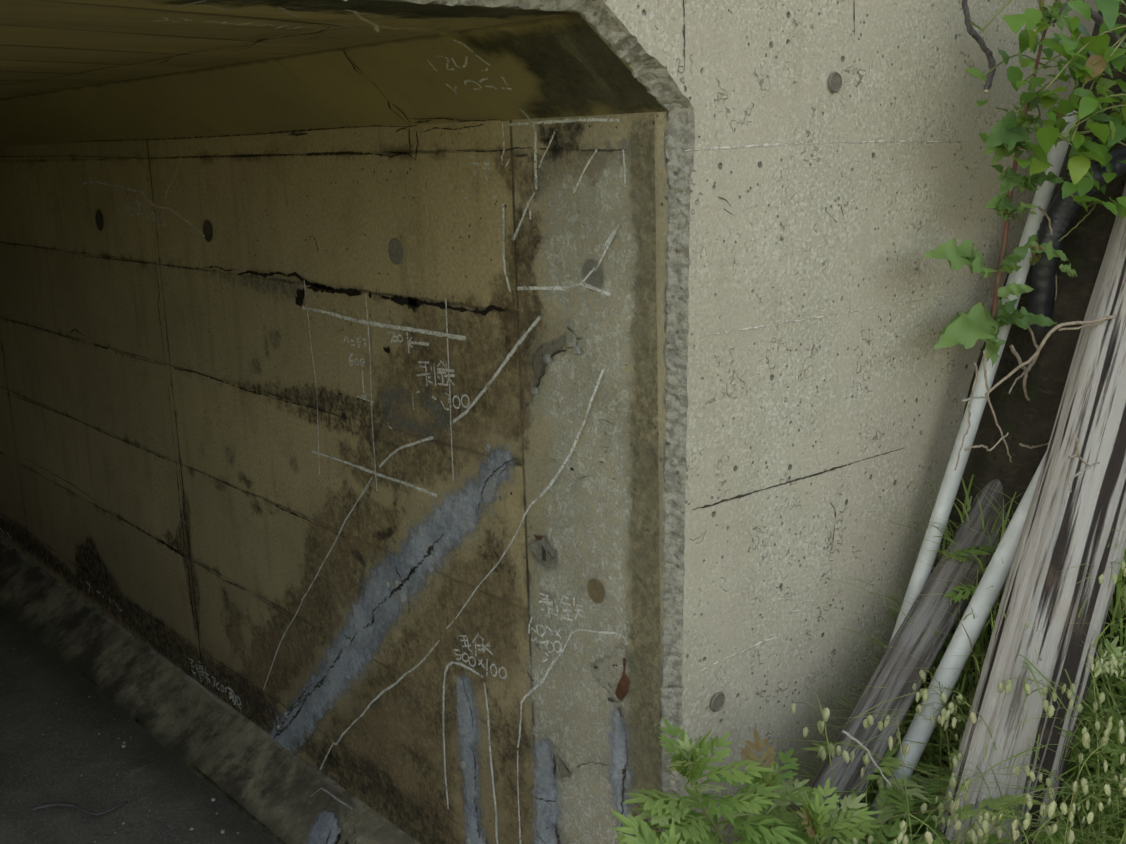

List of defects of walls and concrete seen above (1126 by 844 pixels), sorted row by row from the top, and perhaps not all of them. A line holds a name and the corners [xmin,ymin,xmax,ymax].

damp [0,0,664,734]